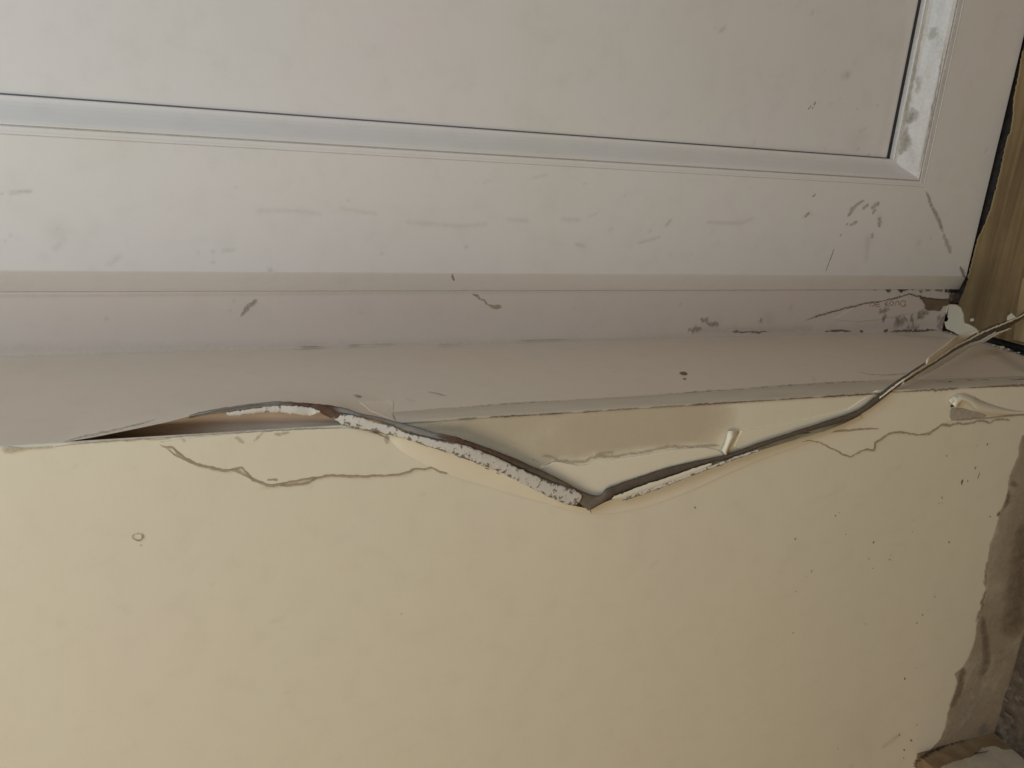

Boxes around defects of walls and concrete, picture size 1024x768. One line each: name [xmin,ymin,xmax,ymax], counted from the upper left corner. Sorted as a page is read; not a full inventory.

peeling [3,410,429,485]
crack [161,445,446,487]
peeling [392,376,1024,502]
crack [803,414,1024,458]